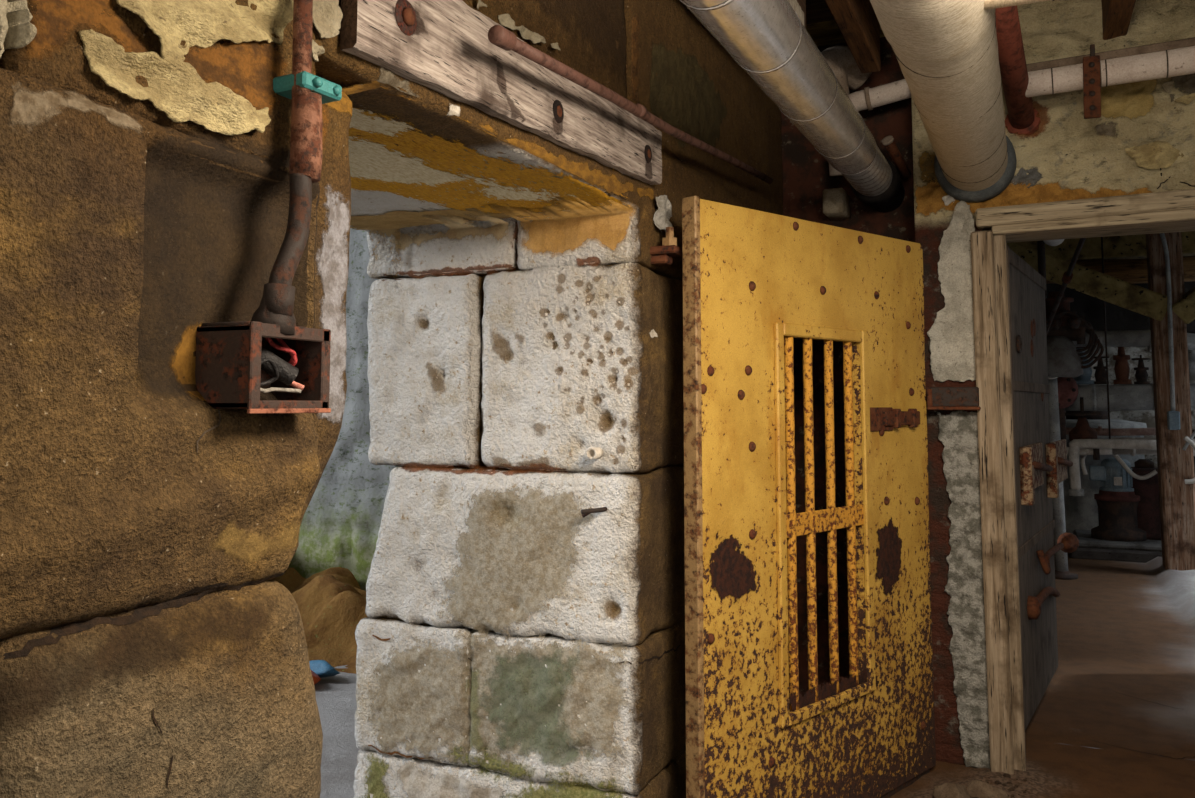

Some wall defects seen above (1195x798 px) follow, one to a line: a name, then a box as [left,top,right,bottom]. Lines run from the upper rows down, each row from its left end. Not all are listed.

peeling [312,0,343,62]
peeling [477,0,561,51]
peeling [0,0,293,135]
peeling [1096,73,1195,137]
spalling [1011,167,1043,188]
peeling [316,67,673,423]
rust [709,533,757,603]
rust [875,517,902,596]
crack [3,566,289,660]
rust [789,669,879,726]